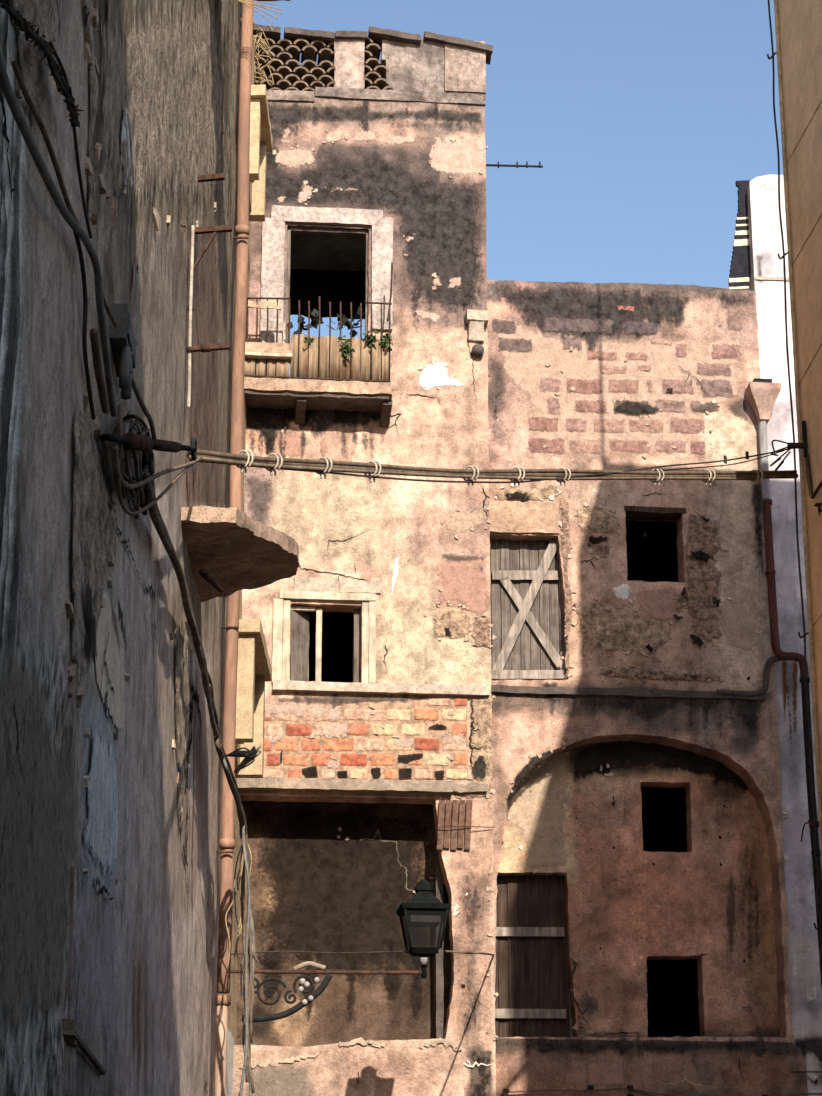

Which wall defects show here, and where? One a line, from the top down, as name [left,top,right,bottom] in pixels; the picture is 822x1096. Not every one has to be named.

damp [266,100,481,315]
damp [496,286,689,351]
damp [720,294,750,305]
flaking render [417,360,464,390]
damp [247,410,380,457]
flaking render [441,483,729,684]
damp [584,699,721,729]
damp [732,701,761,736]
damp [573,741,748,790]
damp [472,1051,491,1096]